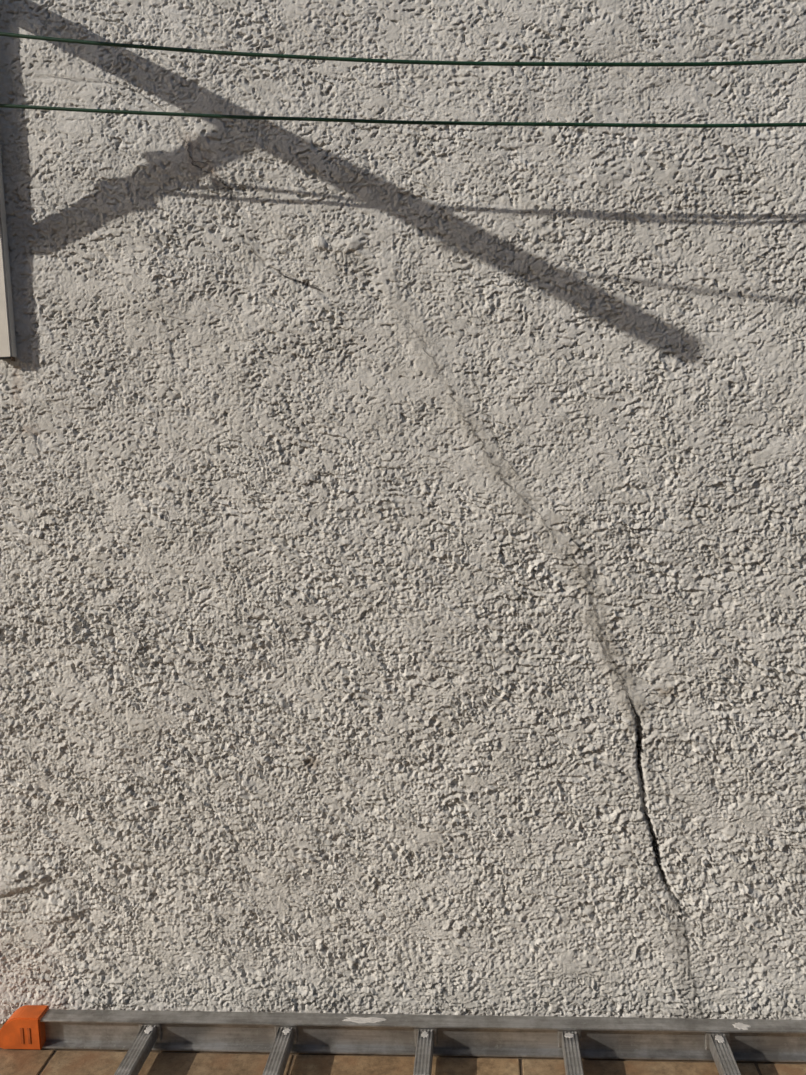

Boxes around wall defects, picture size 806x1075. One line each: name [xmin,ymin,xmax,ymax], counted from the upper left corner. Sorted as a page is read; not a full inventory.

crack [407,322,539,513]
crack [572,537,702,1017]